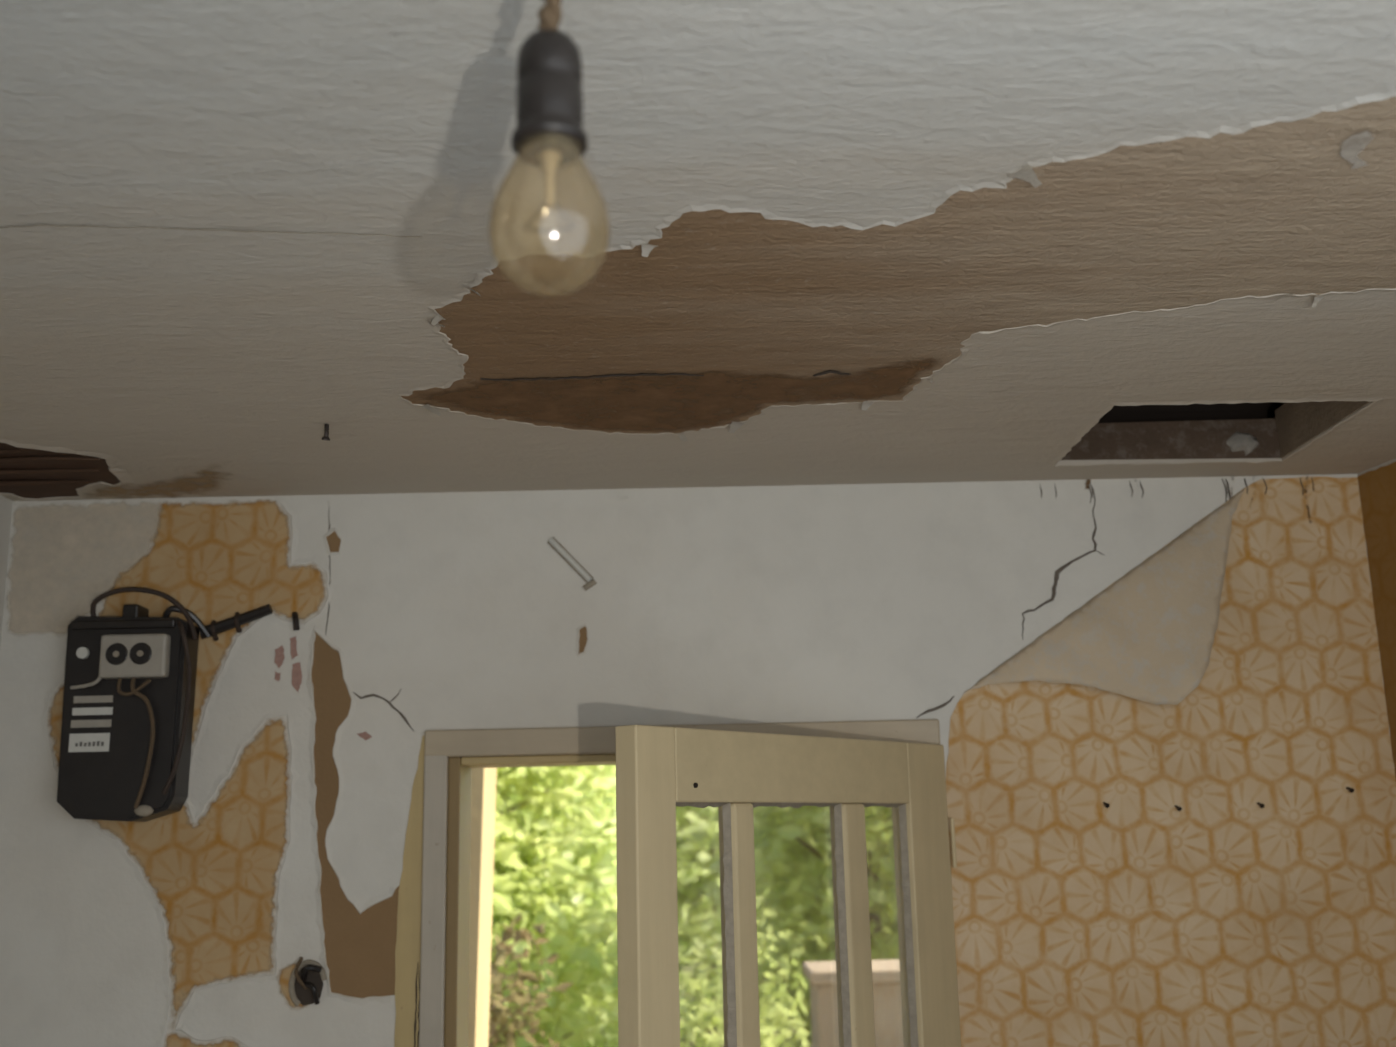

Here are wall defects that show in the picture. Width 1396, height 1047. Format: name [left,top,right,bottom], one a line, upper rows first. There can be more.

flaking render [397,90,1396,442]
crack [1022,489,1105,638]
peeling [8,500,399,1047]